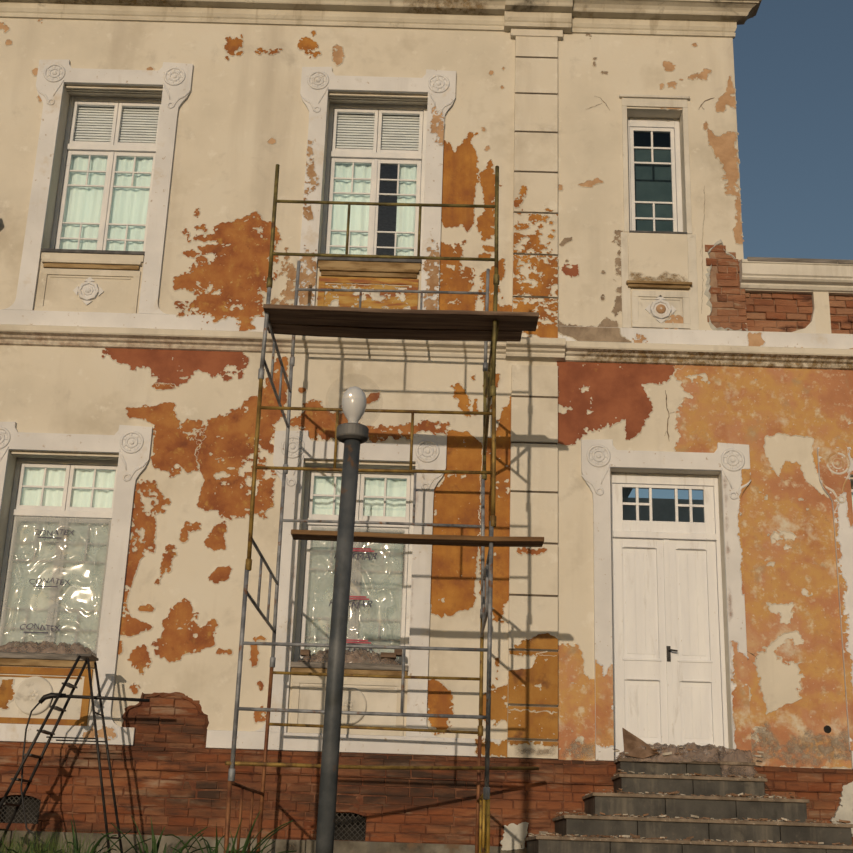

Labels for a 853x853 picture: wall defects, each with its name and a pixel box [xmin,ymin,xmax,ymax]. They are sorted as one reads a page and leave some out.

peeling [223,34,244,61]
peeling [296,30,346,66]
peeling [172,106,648,343]
flaking render [702,121,766,346]
peeling [101,348,250,391]
peeling [450,382,479,418]
peeling [358,396,511,537]
peeling [81,356,348,748]
peeling [430,545,548,624]
peeling [556,361,853,769]
peeling [427,679,455,736]
peeling [474,632,614,761]